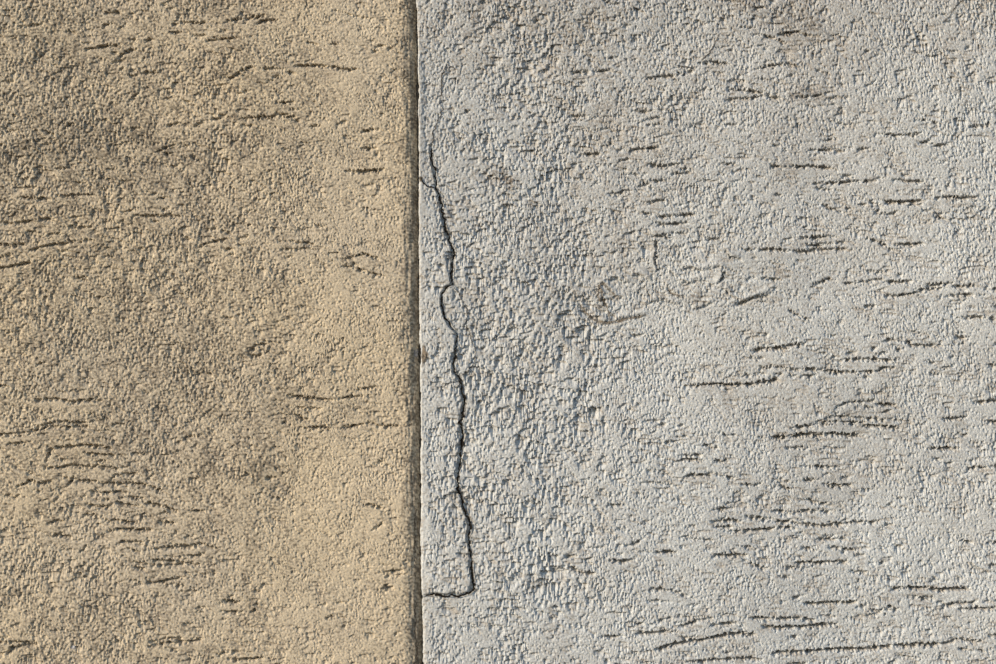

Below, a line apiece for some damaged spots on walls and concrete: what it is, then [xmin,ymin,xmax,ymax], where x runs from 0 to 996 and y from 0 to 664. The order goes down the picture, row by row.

crack [414,64,476,664]